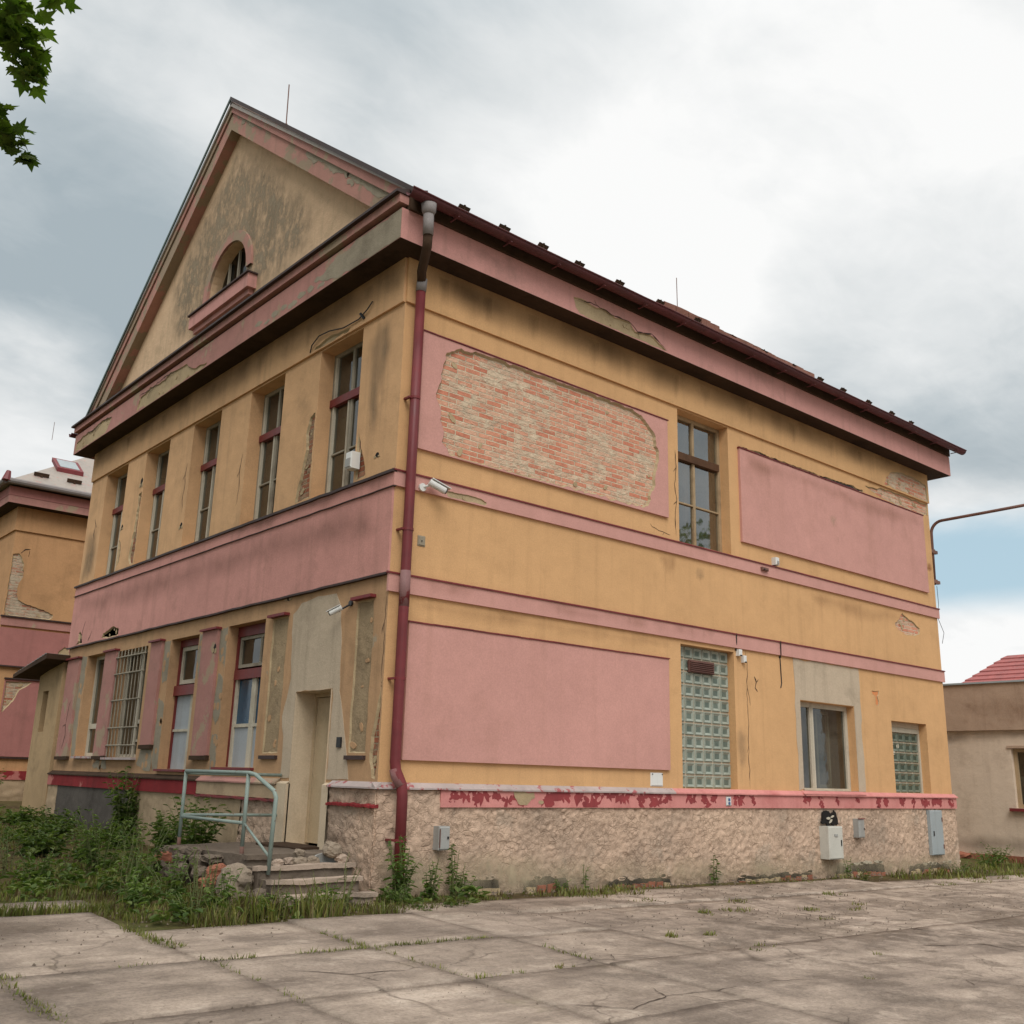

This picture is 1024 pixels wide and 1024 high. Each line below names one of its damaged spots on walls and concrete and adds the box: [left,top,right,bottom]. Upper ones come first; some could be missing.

water stain [177,166,304,334]
flaking render [574,297,667,351]
flaking render [137,363,207,411]
flaking render [295,413,315,503]
flaking render [436,348,659,508]
flaking render [738,446,928,516]
flaking render [4,553,53,620]
flaking render [262,616,289,754]
flaking render [348,599,382,779]
peeling [449,791,672,807]
peeling [686,794,718,808]
peeling [876,797,954,808]